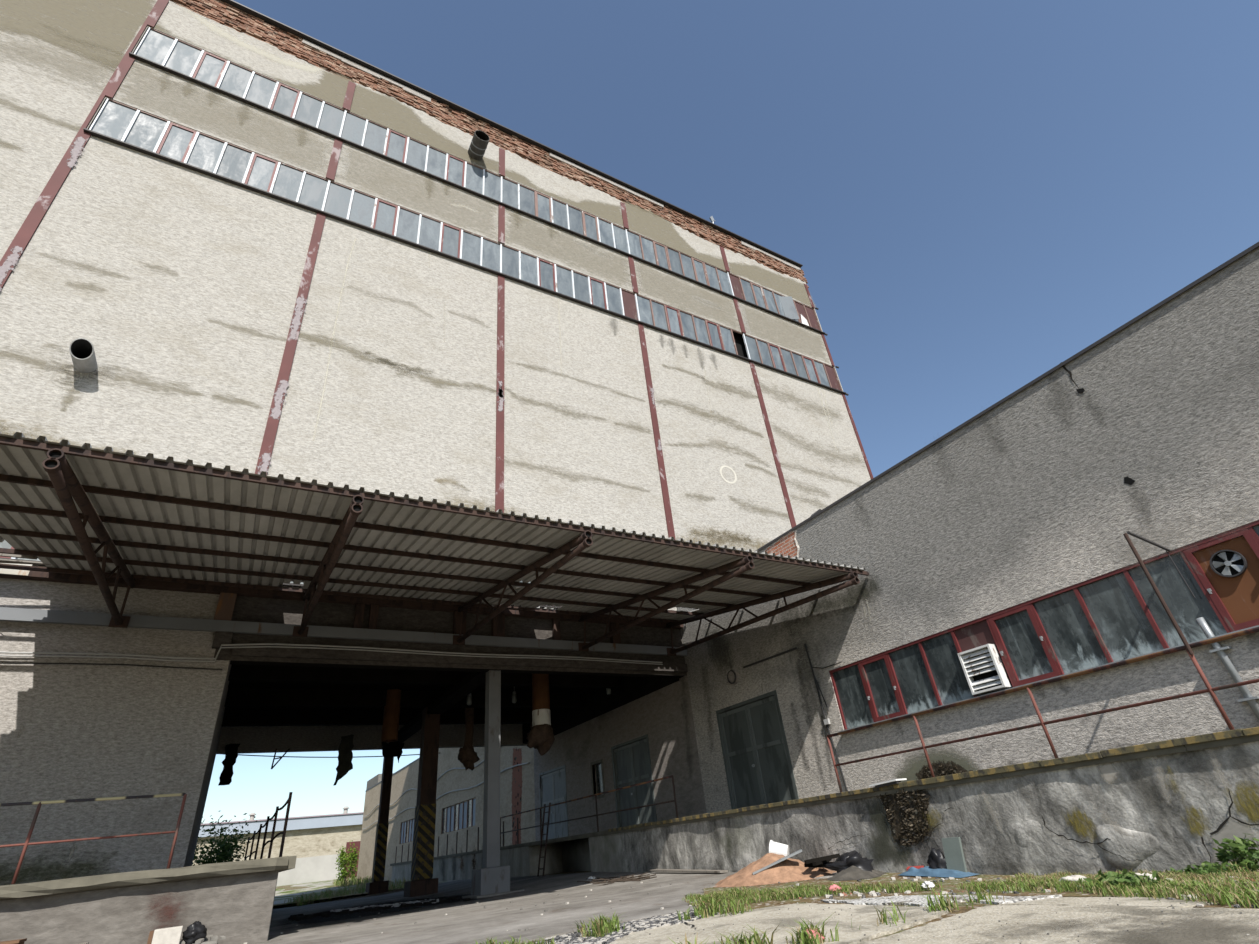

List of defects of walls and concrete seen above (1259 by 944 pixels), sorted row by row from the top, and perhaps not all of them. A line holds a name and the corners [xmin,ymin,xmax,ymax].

leakage [0,0,176,71]
peeling [0,246,22,291]
leakage [658,401,761,436]
crack [1042,817,1142,861]
crack [1201,788,1259,862]